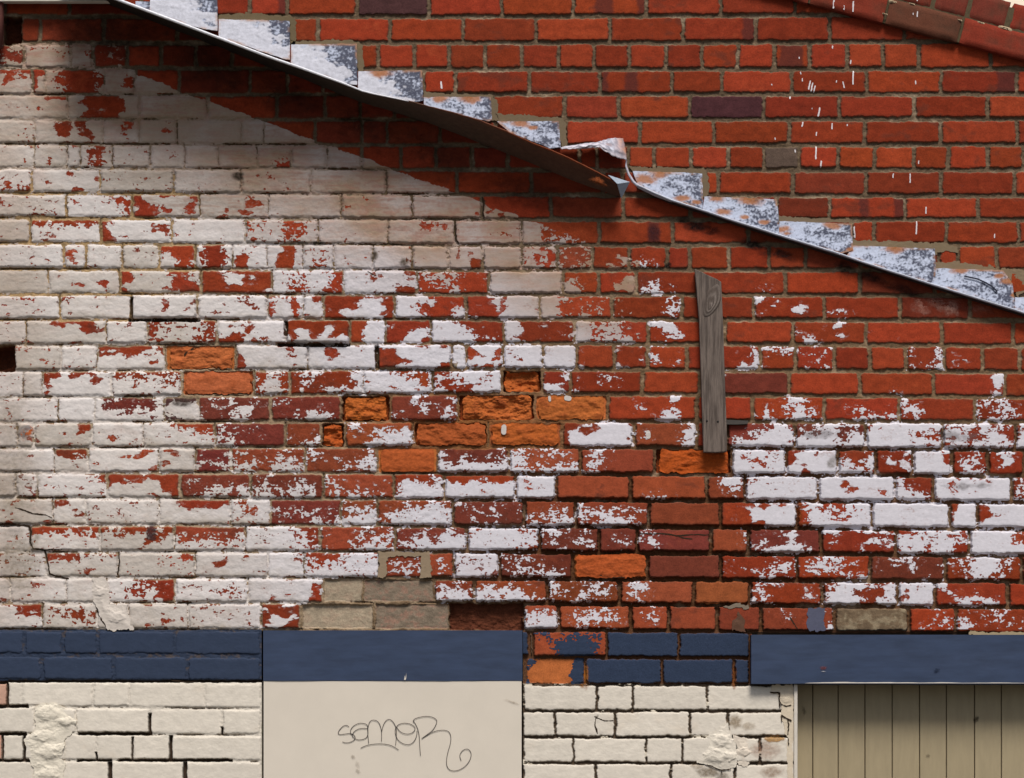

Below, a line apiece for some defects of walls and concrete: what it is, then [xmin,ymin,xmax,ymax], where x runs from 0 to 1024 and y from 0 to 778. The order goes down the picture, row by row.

peeling [0,43,685,684]
crack [0,507,69,579]
peeling [635,374,1024,629]